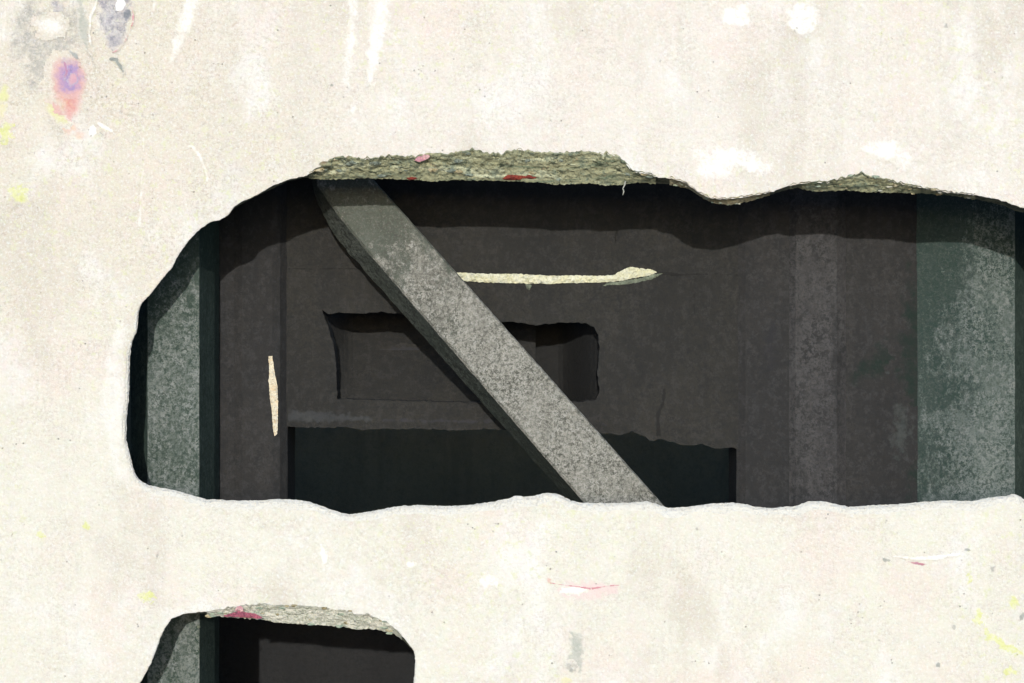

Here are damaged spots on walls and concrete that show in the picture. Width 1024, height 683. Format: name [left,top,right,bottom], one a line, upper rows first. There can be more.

spalling [309,142,656,186]
spalling [669,176,770,205]
spalling [790,171,975,200]
spalling [457,267,662,290]
spalling [268,356,278,436]
spalling [205,603,402,640]